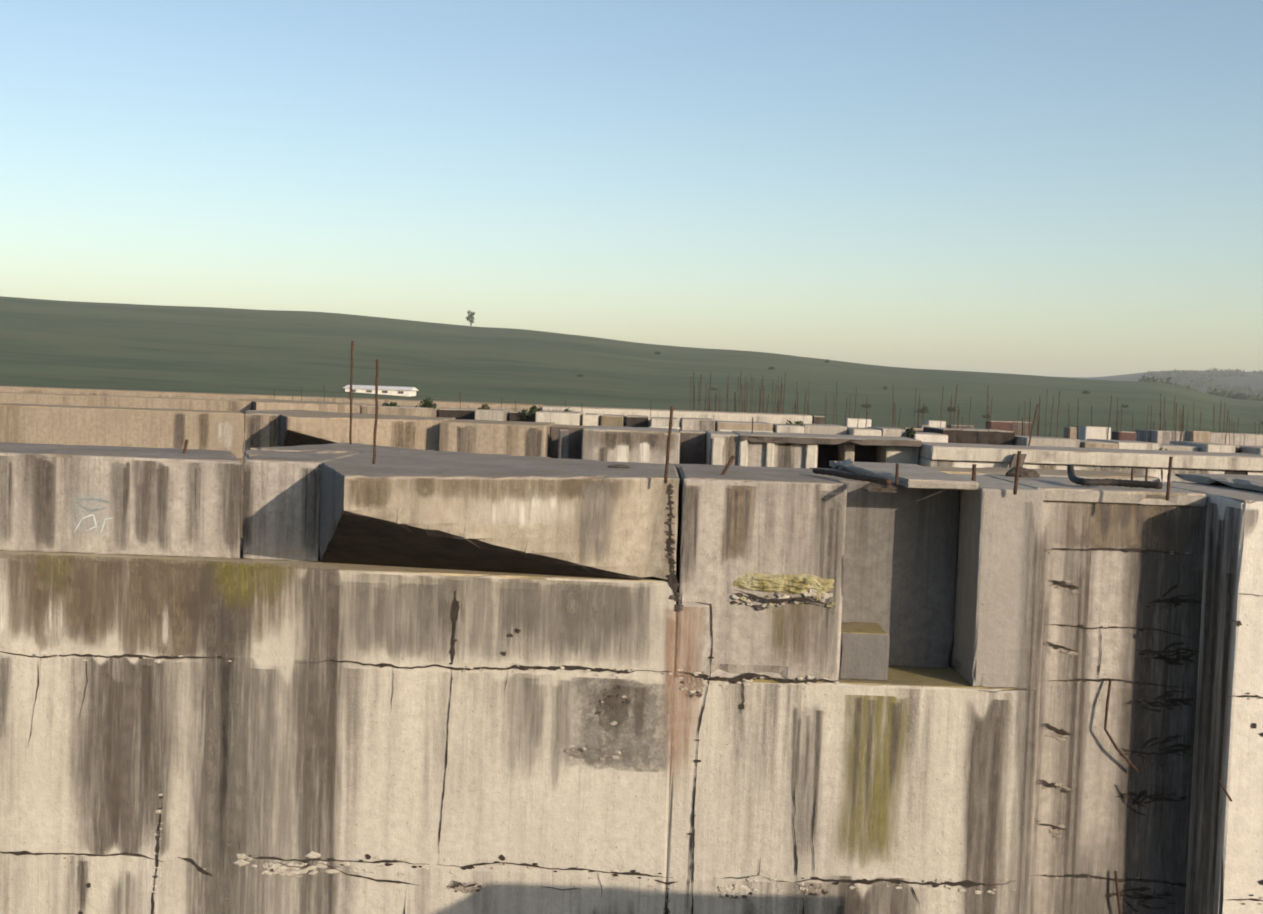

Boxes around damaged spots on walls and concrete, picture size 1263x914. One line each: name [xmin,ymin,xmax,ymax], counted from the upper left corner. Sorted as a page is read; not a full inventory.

water stain [395,576,630,657]
water stain [0,456,342,914]
spalling [562,746,625,760]
crack [0,484,1202,914]
water stain [556,677,664,771]
spalling [594,685,632,732]
water stain [793,710,822,832]
water stain [967,510,1050,914]
water stain [1054,502,1255,914]
crack [1227,692,1263,700]
spalling [261,862,328,878]
crack [1221,895,1263,905]